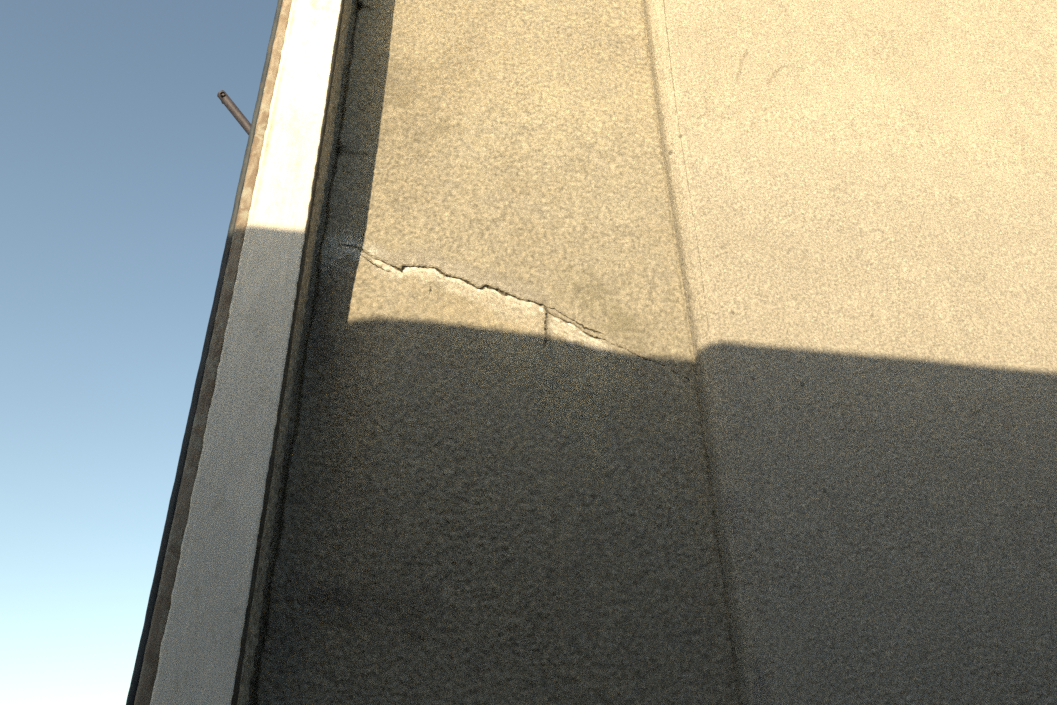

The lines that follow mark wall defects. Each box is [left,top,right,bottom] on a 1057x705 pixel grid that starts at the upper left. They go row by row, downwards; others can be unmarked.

crack [348,246,689,380]